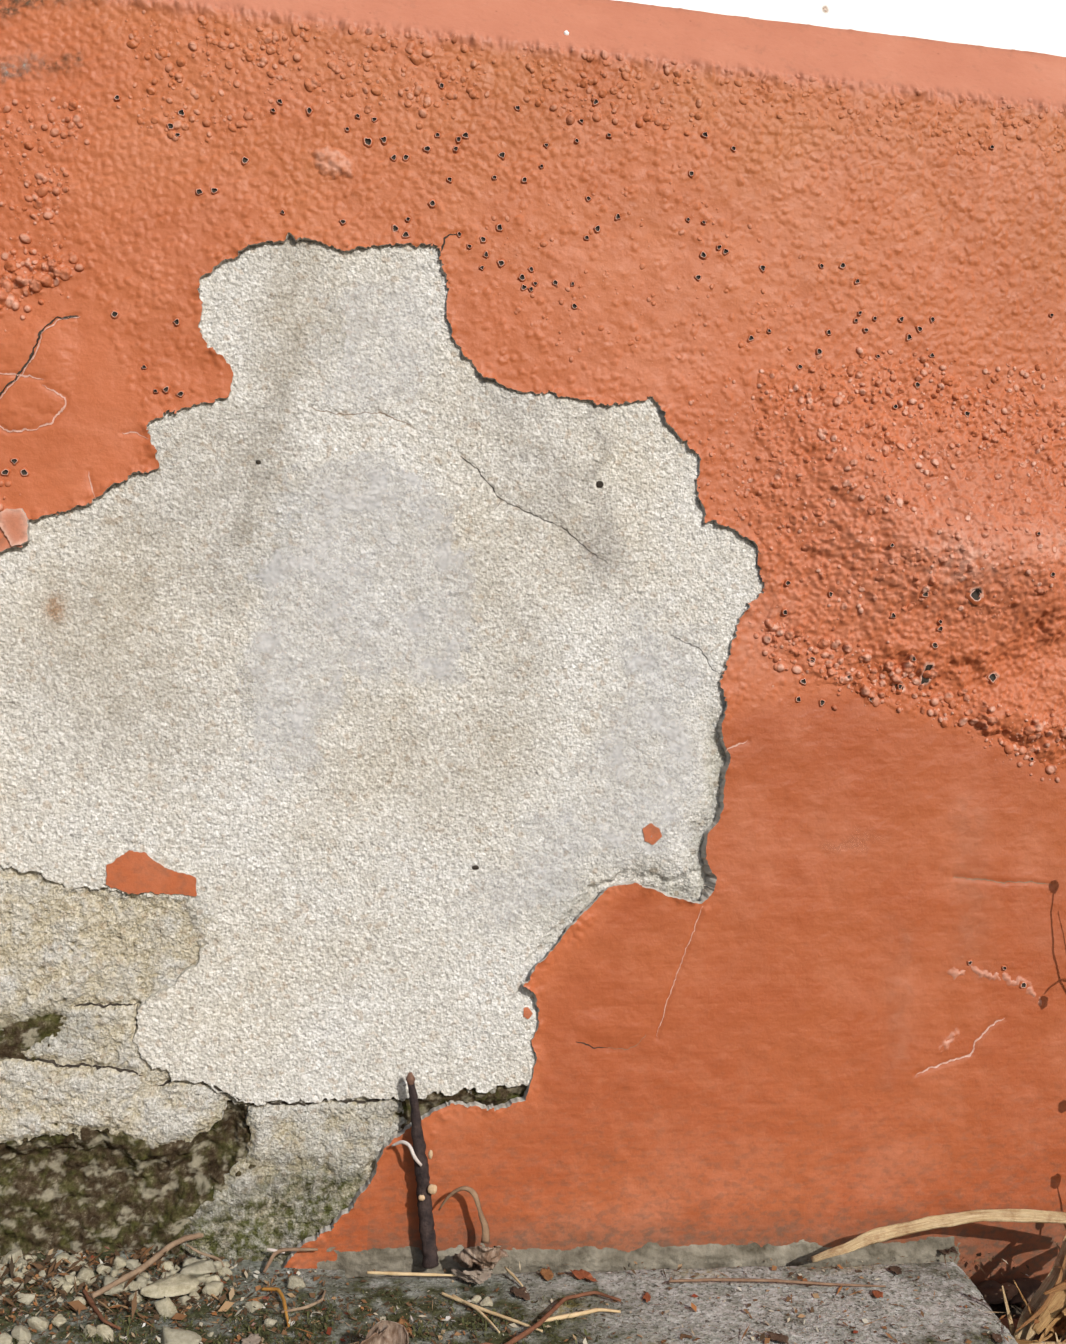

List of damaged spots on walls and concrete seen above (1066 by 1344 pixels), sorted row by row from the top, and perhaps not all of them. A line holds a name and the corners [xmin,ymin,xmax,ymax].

crack [0,315,79,432]
peeling [0,235,764,1267]
crack [577,906,703,1050]
crack [916,1019,1003,1075]